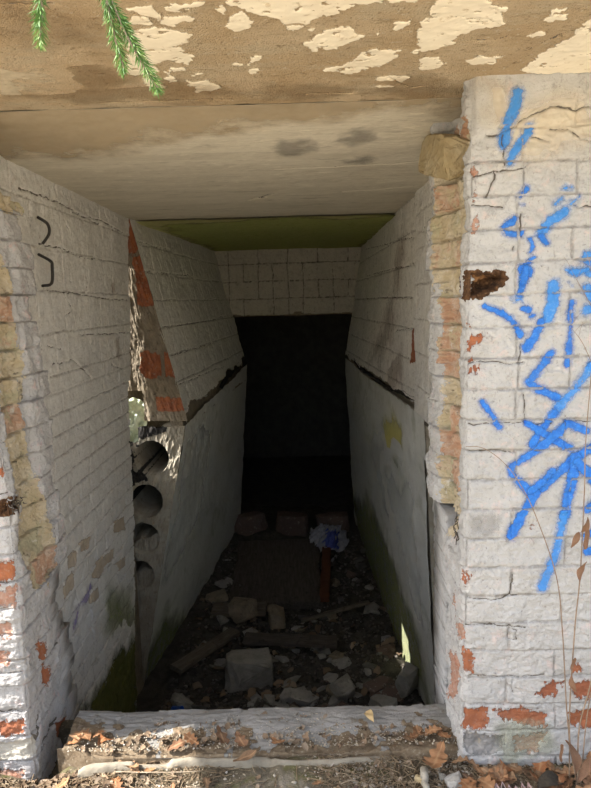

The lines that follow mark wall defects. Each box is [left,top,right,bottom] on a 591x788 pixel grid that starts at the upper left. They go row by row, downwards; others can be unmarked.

peeling [123,1,221,93]
peeling [215,0,418,52]
peeling [323,0,509,88]
peeling [520,19,591,74]
water stain [0,101,377,158]
crack [471,106,583,250]
crack [179,357,244,389]
spalling [429,165,509,537]
spalling [0,254,90,609]
spalling [0,718,36,779]
peeling [460,705,548,755]
peeling [568,662,591,730]